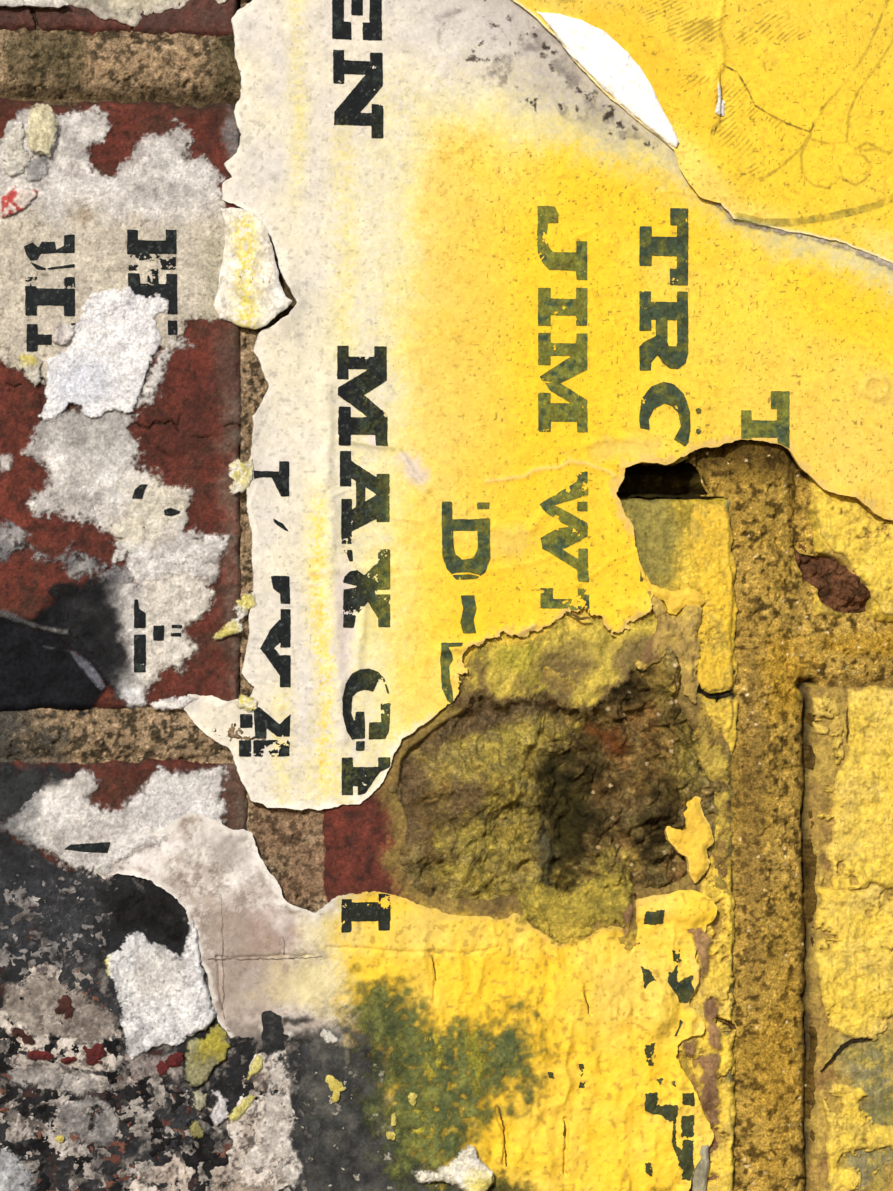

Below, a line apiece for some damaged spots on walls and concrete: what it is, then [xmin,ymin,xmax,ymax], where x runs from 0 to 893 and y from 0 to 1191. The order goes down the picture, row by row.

peeling [0,103,58,218]
peeling [214,207,292,330]
peeling [18,287,169,421]
peeling [228,459,254,494]
peeling [792,491,893,615]
peeling [214,592,257,640]
peeling [639,503,739,755]
peeling [237,695,257,712]
spalling [388,645,737,1191]
peeling [105,919,256,1138]
peeling [246,1055,264,1080]
peeling [320,1029,338,1043]